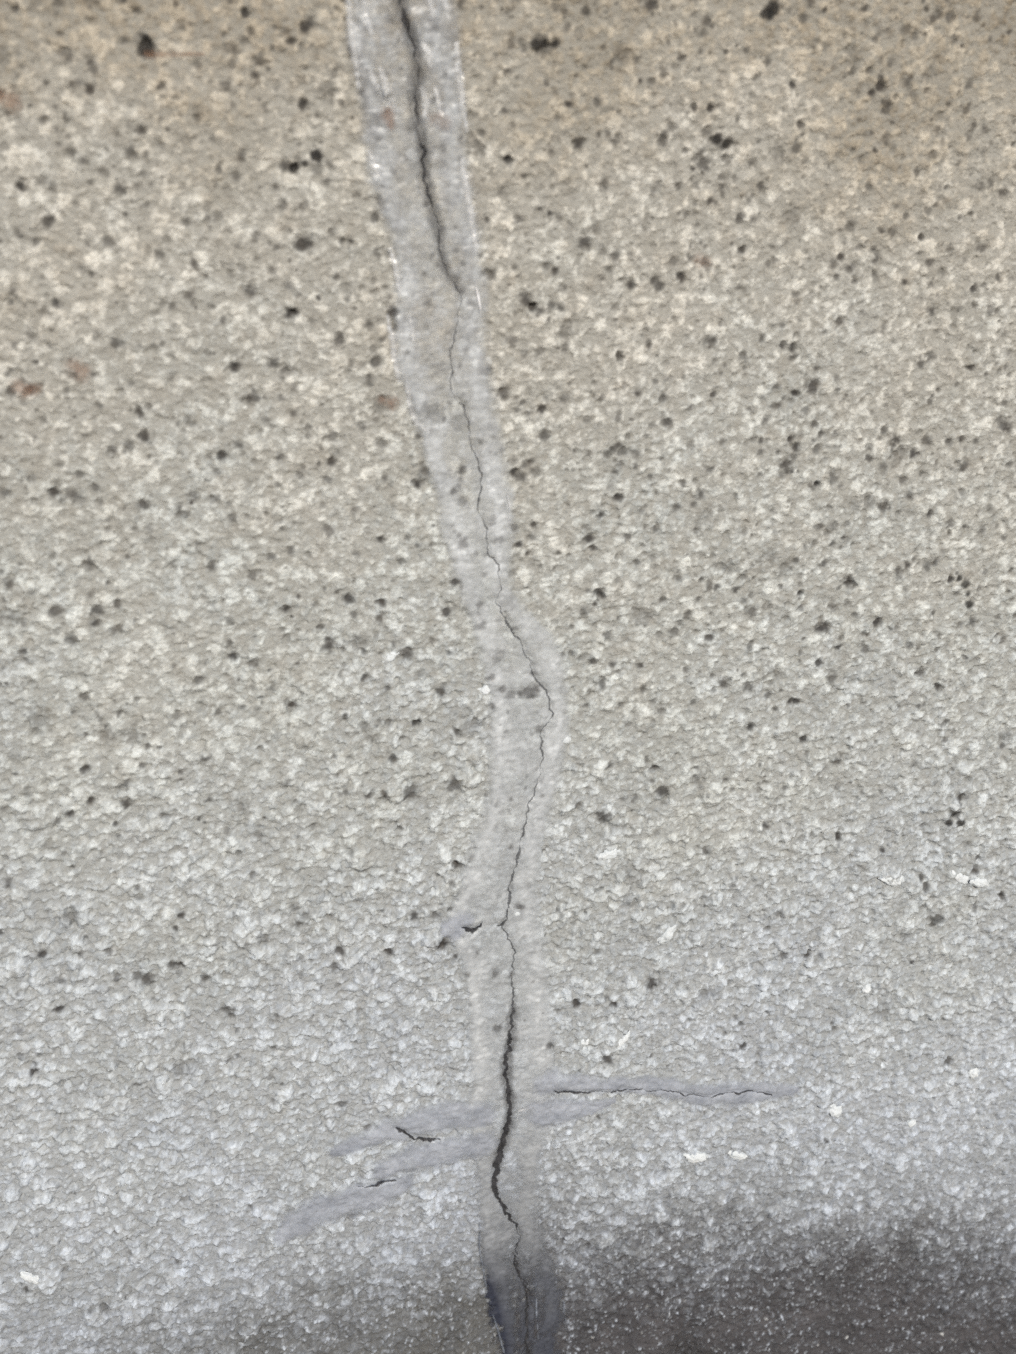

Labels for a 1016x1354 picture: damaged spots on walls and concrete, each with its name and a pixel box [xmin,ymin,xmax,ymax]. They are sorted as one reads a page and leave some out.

crack [395,0,554,1354]
crack [555,1089,772,1097]
crack [359,1180,397,1188]